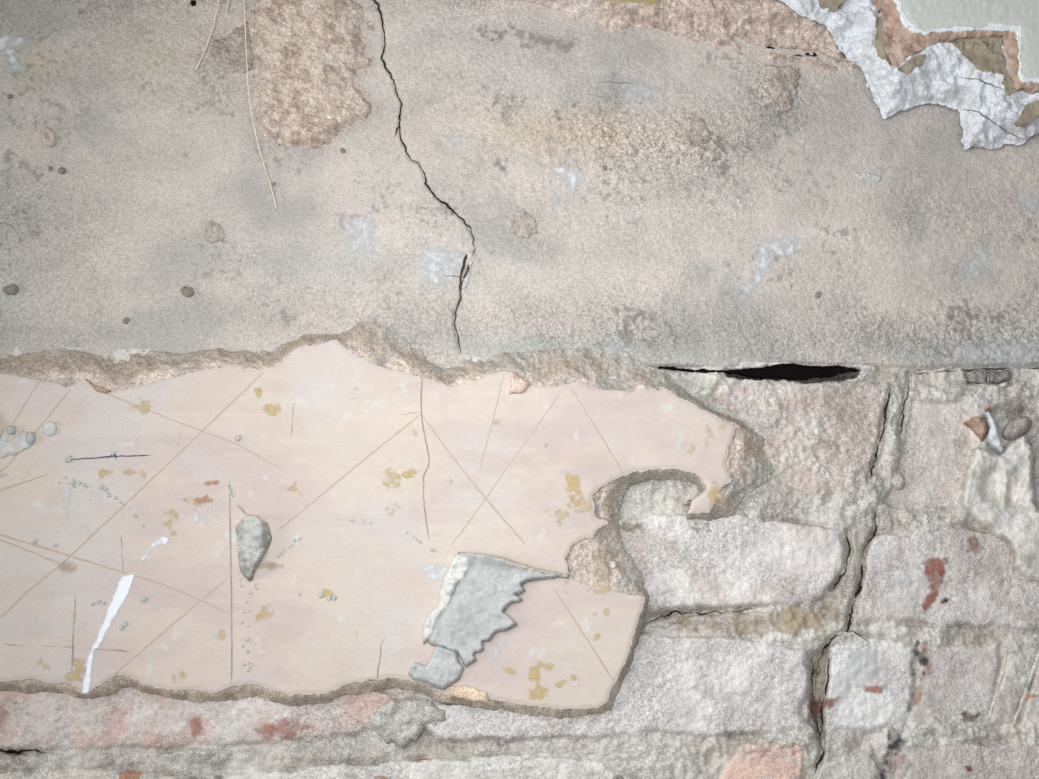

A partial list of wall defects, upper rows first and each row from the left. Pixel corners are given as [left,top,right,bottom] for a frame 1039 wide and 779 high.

crack [373,0,476,352]
spalling [0,321,773,719]
peeling [966,371,1010,384]